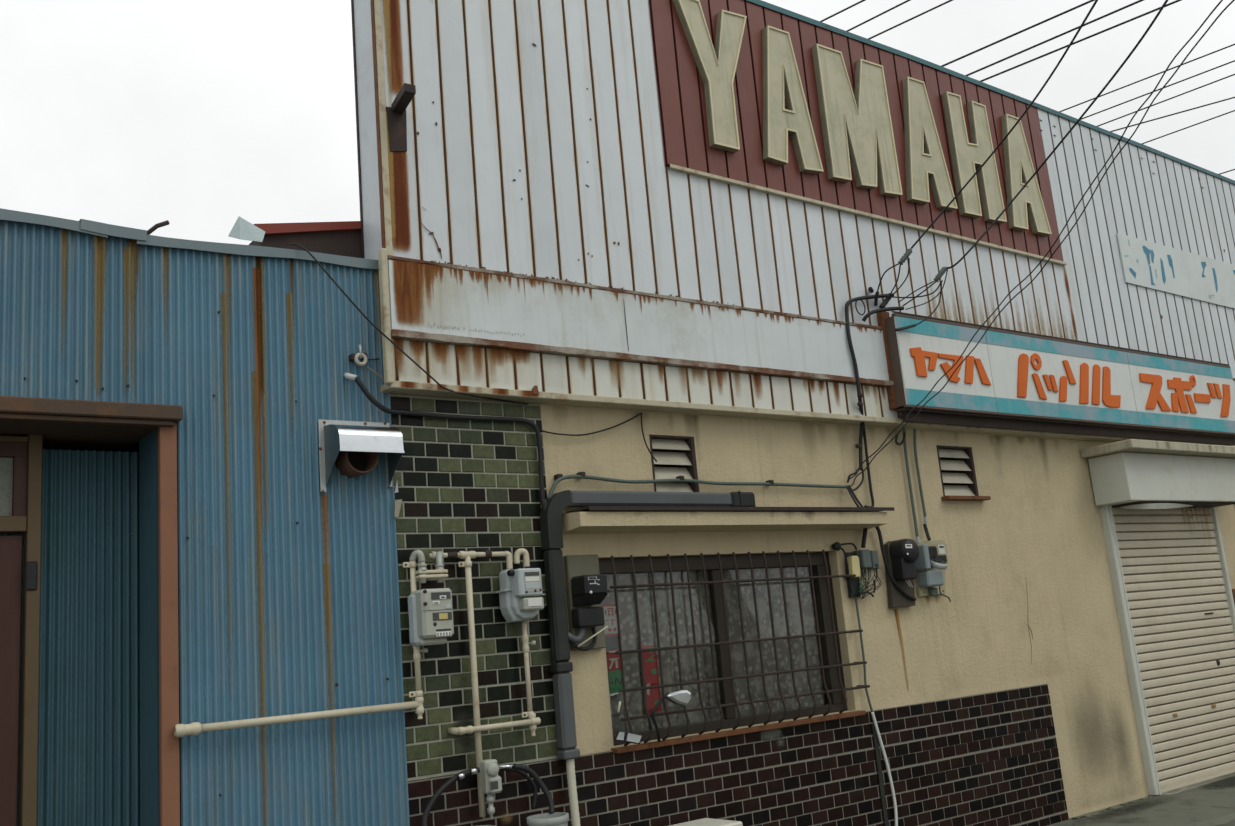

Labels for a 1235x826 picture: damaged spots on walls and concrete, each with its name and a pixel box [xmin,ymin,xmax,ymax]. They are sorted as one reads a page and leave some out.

corrosion [383,0,404,93]
corrosion [374,111,592,328]
corrosion [94,235,106,386]
corrosion [123,239,139,376]
corrosion [634,294,741,315]
corrosion [394,338,529,369]
corrosion [493,388,538,397]
corrosion [680,367,761,393]
corrosion [803,379,839,400]
corrosion [252,256,268,822]
water stain [1204,776,1235,789]
water stain [1091,801,1160,819]